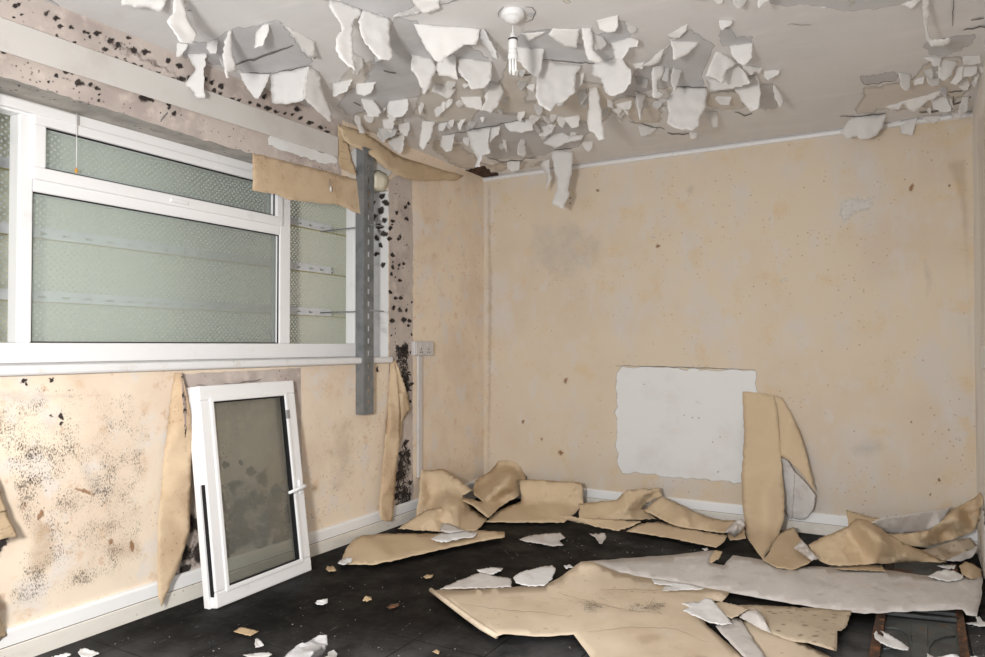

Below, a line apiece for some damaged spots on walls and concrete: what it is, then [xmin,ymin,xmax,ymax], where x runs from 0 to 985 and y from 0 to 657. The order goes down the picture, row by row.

water stain [47,71,101,102]
water stain [44,11,190,82]
water stain [204,77,330,133]
peeling [0,0,785,209]
peeling [713,0,985,139]
flaking render [368,157,414,506]
water stain [374,184,414,403]
water stain [0,399,143,604]
flaking render [176,460,201,575]
flaking render [183,368,302,466]
flaking render [214,398,292,558]